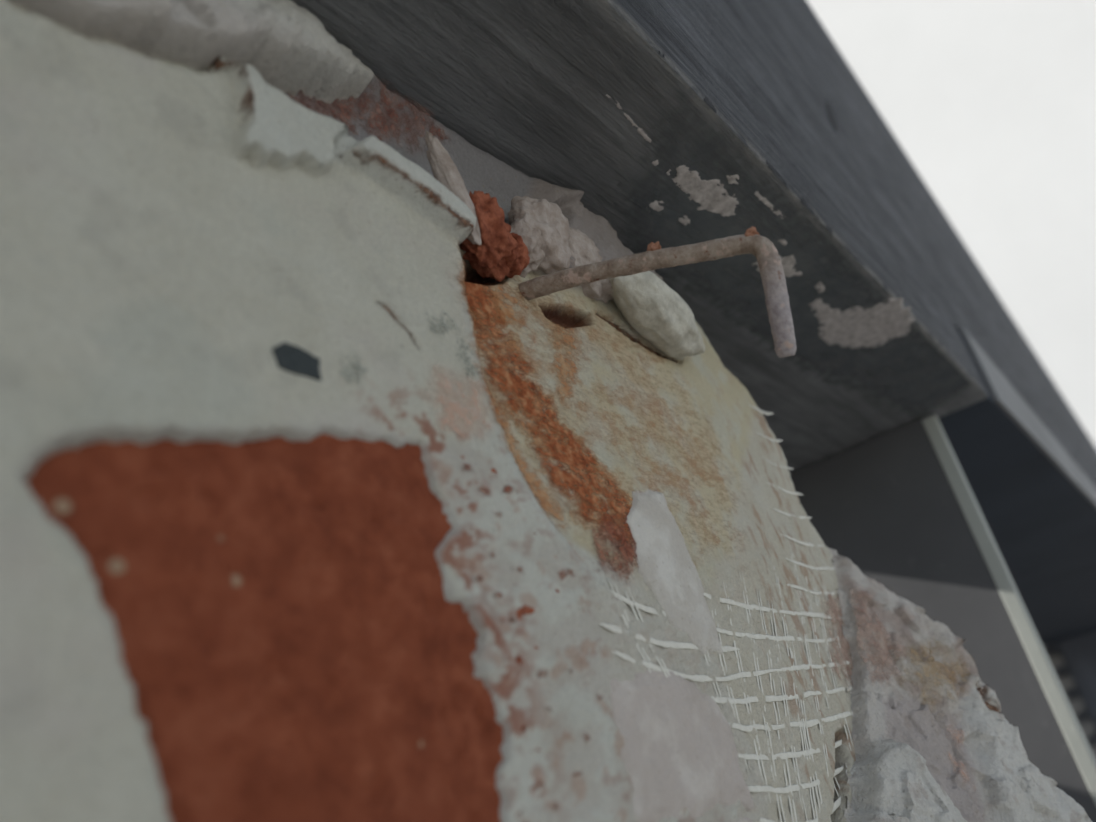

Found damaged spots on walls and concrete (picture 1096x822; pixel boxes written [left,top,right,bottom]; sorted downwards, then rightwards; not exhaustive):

peeling [652,160,742,225]
peeling [778,240,802,277]
peeling [808,282,914,348]
rust [463,281,637,578]
flaking render [23,434,503,822]
flaking render [509,605,535,623]
flaking render [625,489,723,655]
flaking render [827,547,1092,822]